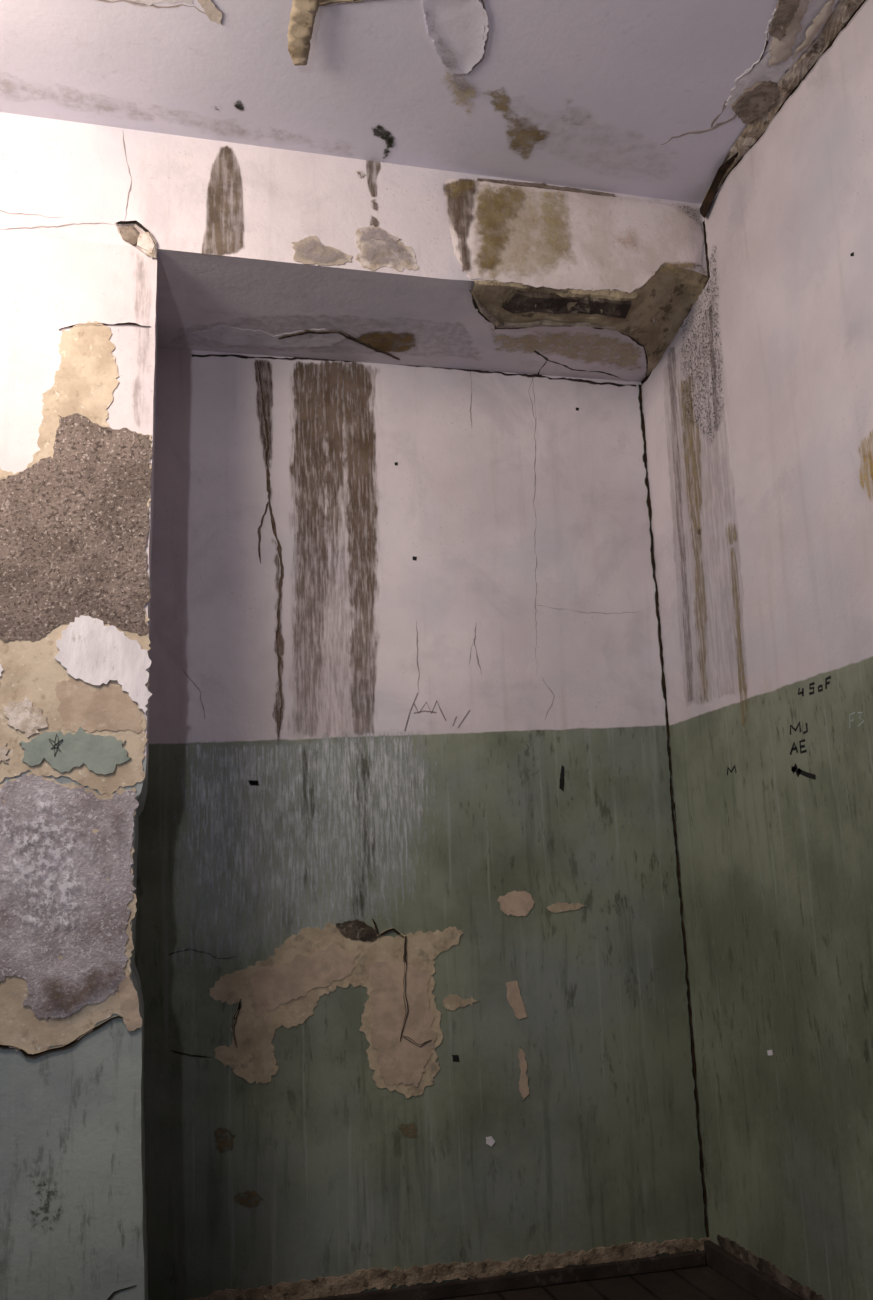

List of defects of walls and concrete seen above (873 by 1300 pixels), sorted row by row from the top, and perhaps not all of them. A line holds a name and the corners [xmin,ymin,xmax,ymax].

crack [93,0,223,26]
peeling [287,0,363,66]
peeling [702,0,864,203]
water stain [202,146,243,256]
water stain [443,179,567,271]
crack [59,322,151,331]
spalling [471,267,708,376]
water stain [663,247,724,441]
water stain [291,361,377,709]
peeling [0,321,153,1059]
peeling [209,919,478,1098]
crack [106,1285,136,1300]